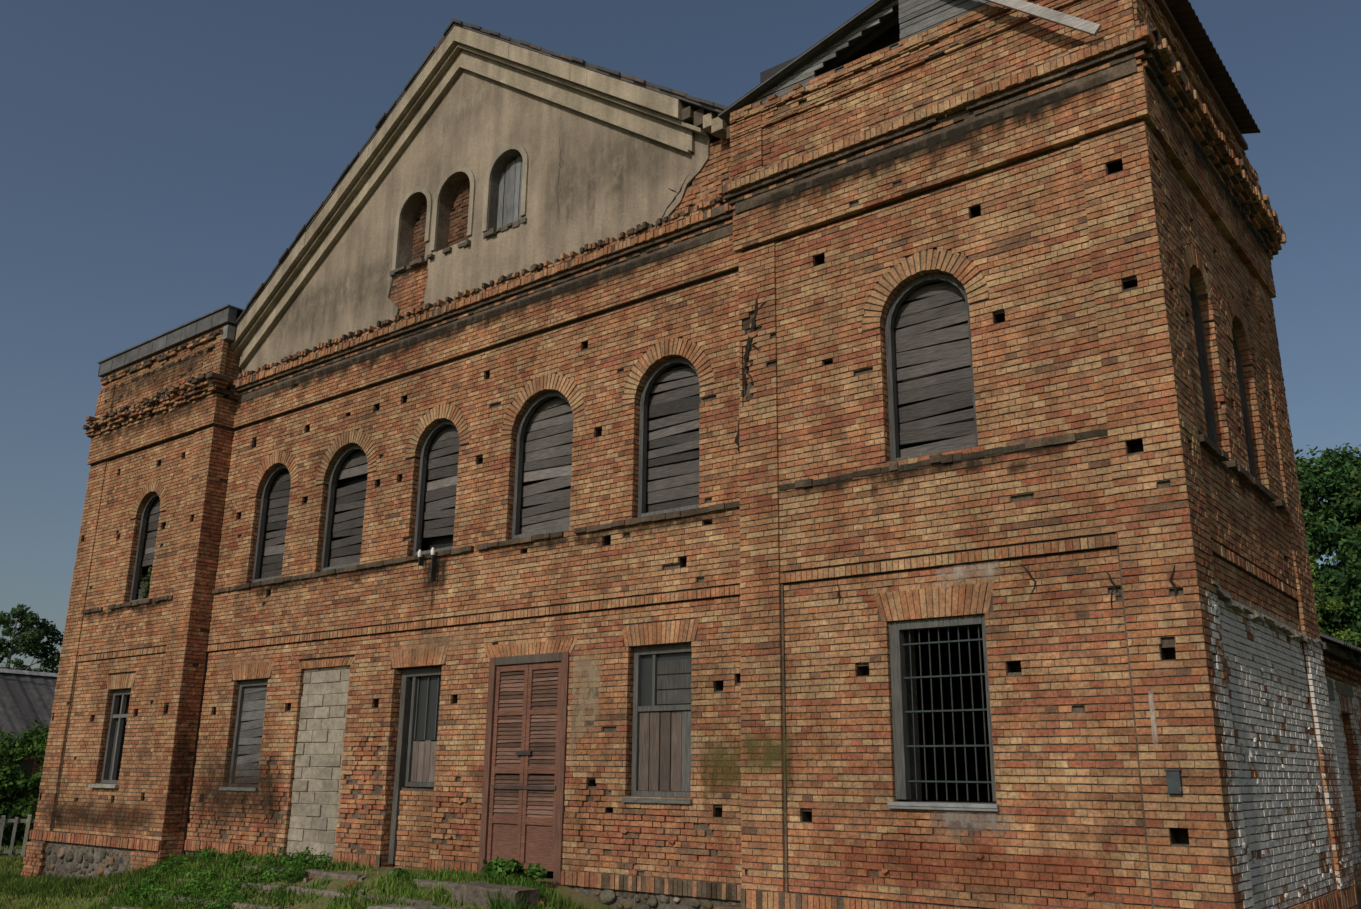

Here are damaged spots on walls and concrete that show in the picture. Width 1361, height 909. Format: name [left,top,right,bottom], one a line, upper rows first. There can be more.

crack [734,294,766,456]
peeling [1214,604,1231,687]
peeling [1232,717,1262,784]
peeling [1305,722,1347,888]
peeling [1241,843,1265,864]
peeling [1278,884,1309,903]